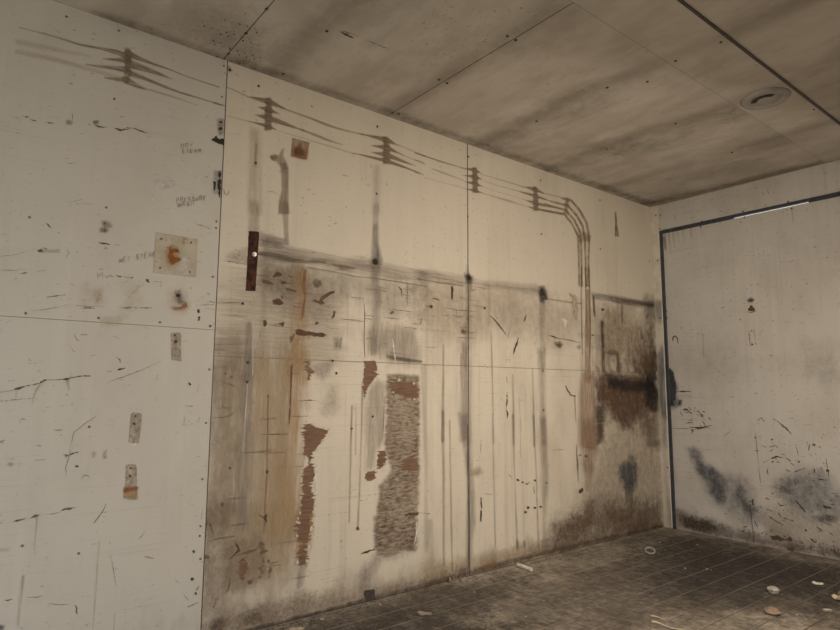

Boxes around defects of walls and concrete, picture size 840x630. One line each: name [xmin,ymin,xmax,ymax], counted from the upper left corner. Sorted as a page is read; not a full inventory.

rust [167,246,181,265]
peeling [362,359,379,399]
peeling [361,376,430,555]
water stain [522,187,658,438]